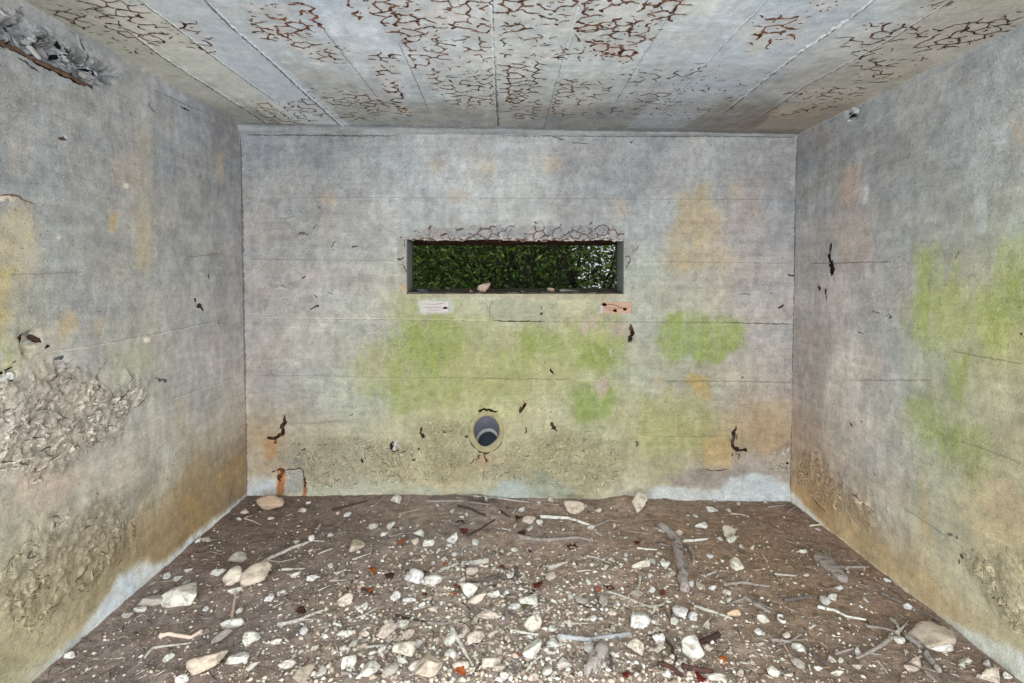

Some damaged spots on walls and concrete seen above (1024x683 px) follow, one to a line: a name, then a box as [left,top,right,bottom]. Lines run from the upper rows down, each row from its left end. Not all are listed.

spalling [0,2,122,91]
crack [33,0,227,58]
crack [235,0,1024,144]
spalling [0,330,167,635]